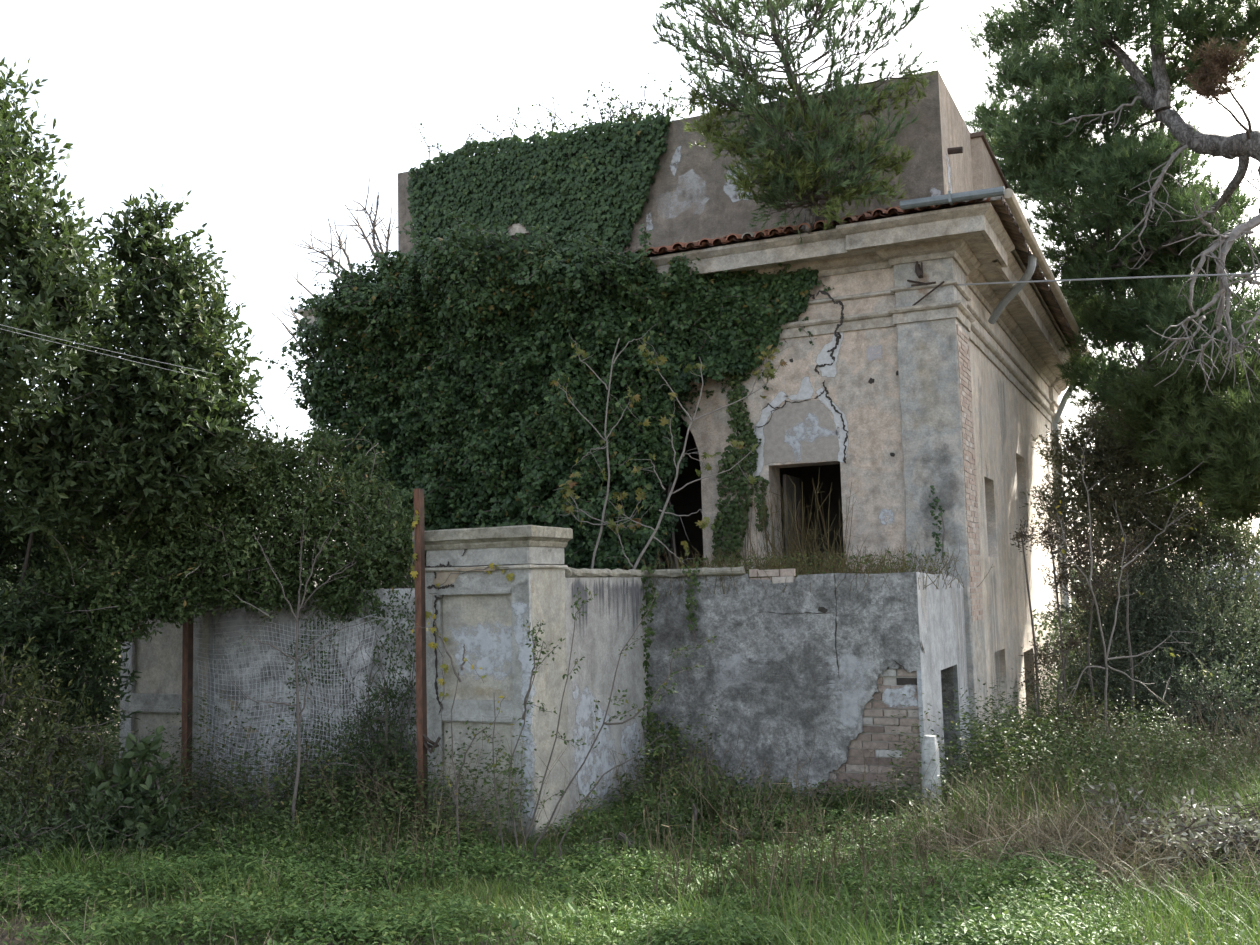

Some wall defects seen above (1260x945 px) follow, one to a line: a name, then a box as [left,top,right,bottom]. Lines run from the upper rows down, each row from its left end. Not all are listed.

peeling [669,146,709,217]
peeling [724,165,752,202]
peeling [749,332,849,478]
crack [754,290,848,463]
spalling [814,654,922,810]